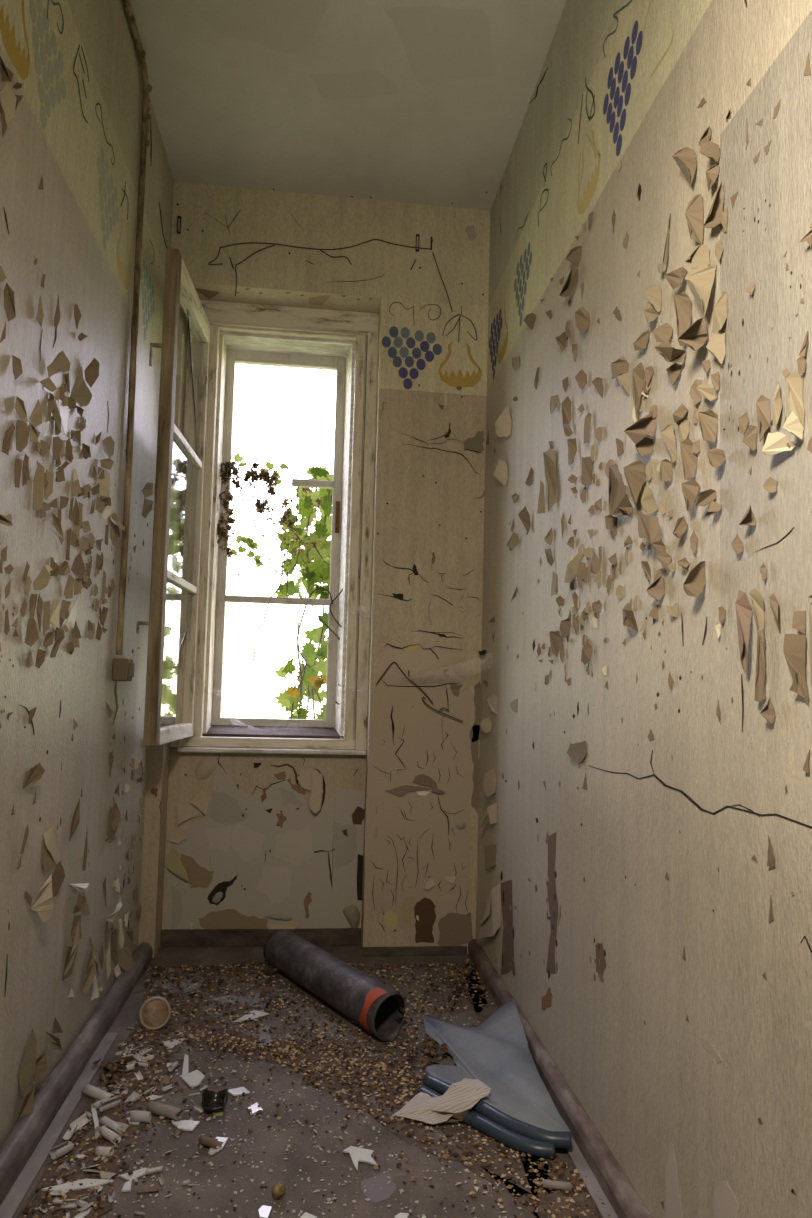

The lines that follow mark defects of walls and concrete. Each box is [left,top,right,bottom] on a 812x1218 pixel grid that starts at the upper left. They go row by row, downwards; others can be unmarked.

peeling [0,56,24,139]
peeling [746,99,781,164]
peeling [34,258,88,341]
peeling [481,680,517,734]
peeling [17,750,48,870]
peeling [24,734,144,1000]
flaking render [164,762,365,930]
peeling [386,774,447,796]
flaking render [414,876,456,943]
flaking render [479,818,561,979]
crack [589,750,812,828]
peeling [15,1017,63,1124]